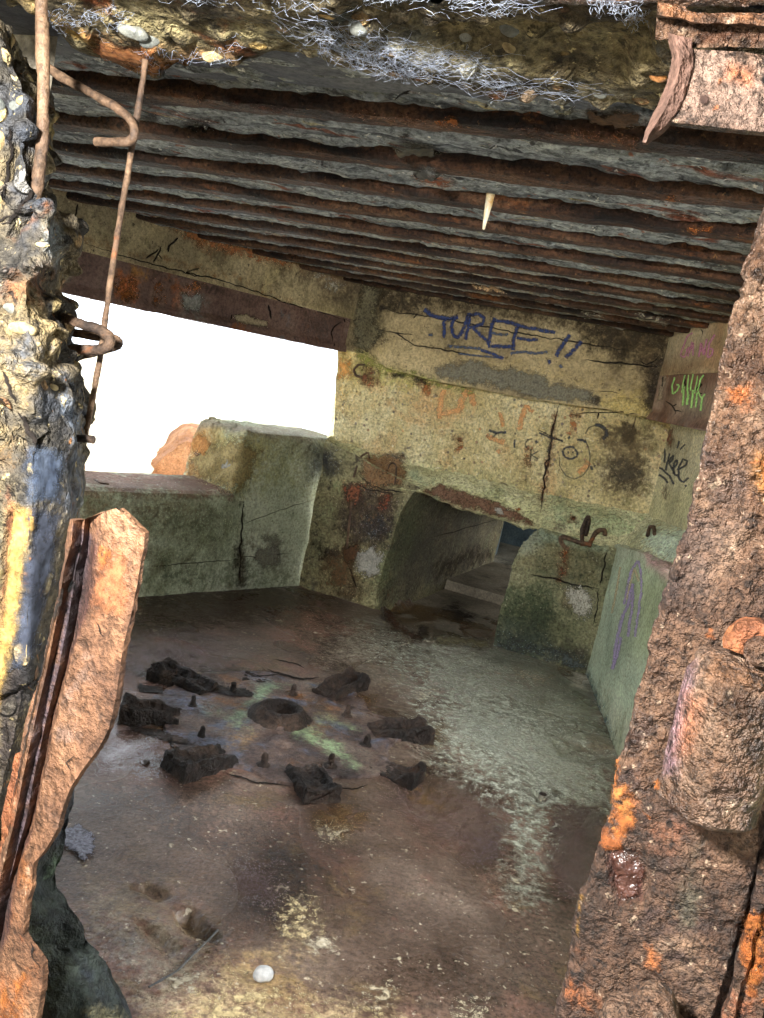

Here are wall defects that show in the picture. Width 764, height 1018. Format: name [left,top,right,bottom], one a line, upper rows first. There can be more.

rust [91,44,155,70]
rust [113,272,140,304]
crack [375,305,681,414]
crack [539,391,636,512]
leakage [610,459,643,490]
leakage [620,422,636,444]
crack [148,498,308,575]
rust [0,508,35,684]
rust [95,546,123,612]
rust [599,759,633,851]
rust [745,916,764,957]